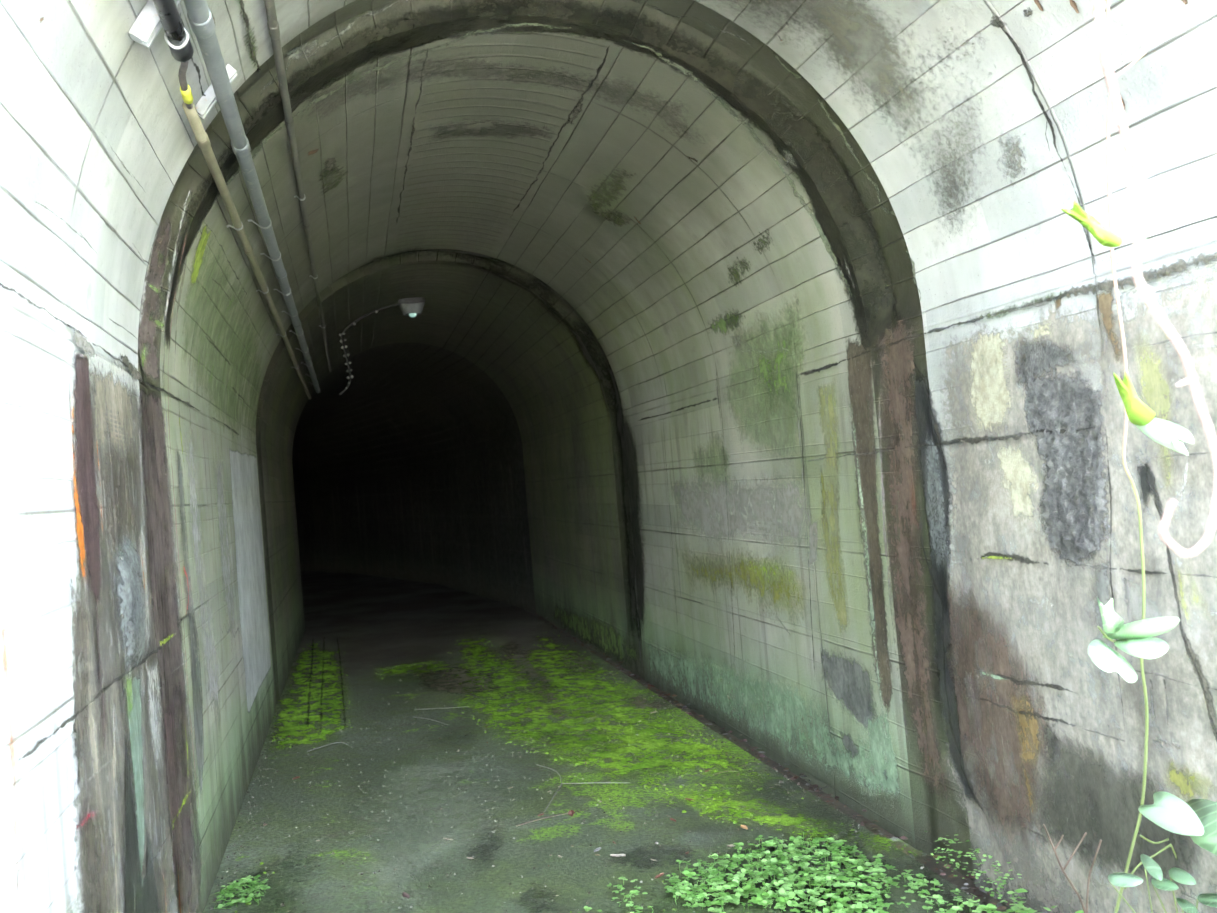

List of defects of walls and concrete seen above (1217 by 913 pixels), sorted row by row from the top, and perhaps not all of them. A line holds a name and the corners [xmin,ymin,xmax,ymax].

crack [396,51,428,222]
crack [511,47,609,216]
crack [993,16,1095,264]
damp [72,0,918,913]
crack [641,291,1217,810]
damp [945,271,1217,913]
damp [738,781,968,913]